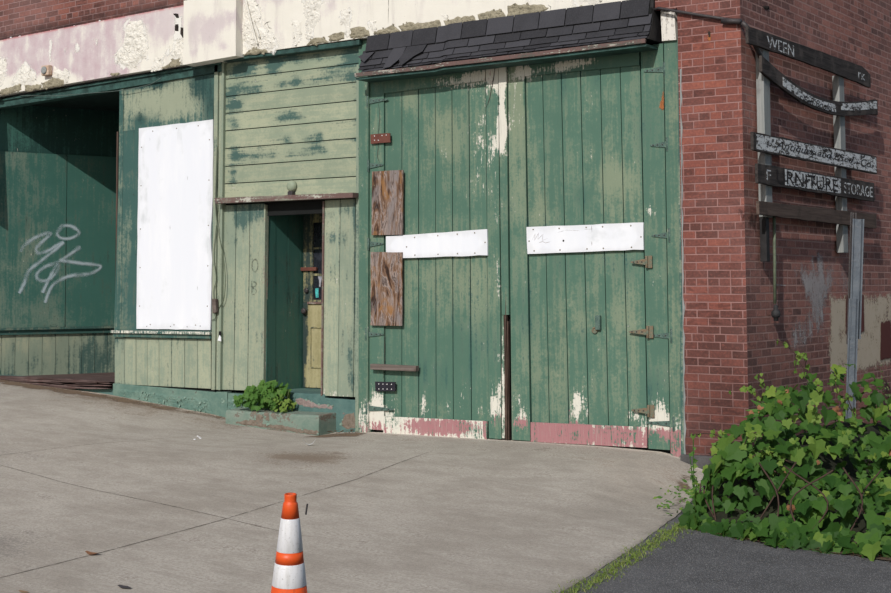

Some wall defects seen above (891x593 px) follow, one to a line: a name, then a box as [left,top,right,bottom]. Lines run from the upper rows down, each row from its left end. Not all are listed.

spalling [110,18,183,76]
spalling [0,57,70,96]